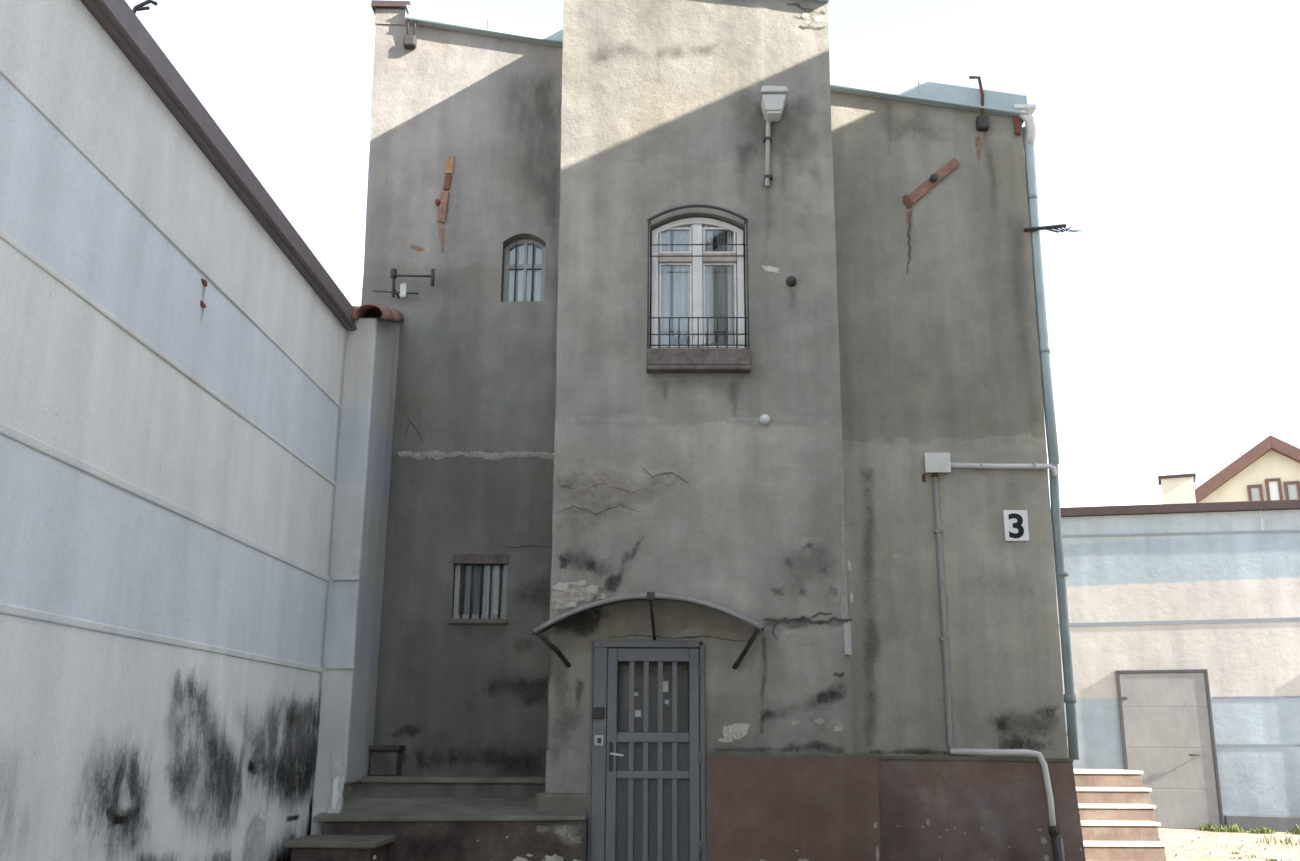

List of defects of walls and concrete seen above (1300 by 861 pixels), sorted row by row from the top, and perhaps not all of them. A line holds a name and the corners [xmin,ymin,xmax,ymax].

spalling [551,580,606,616]
crack [608,612,853,642]
spalling [718,723,751,742]
leakage [173,681,320,823]
leakage [94,760,141,845]
leakage [246,814,312,861]
spalling [536,826,581,843]